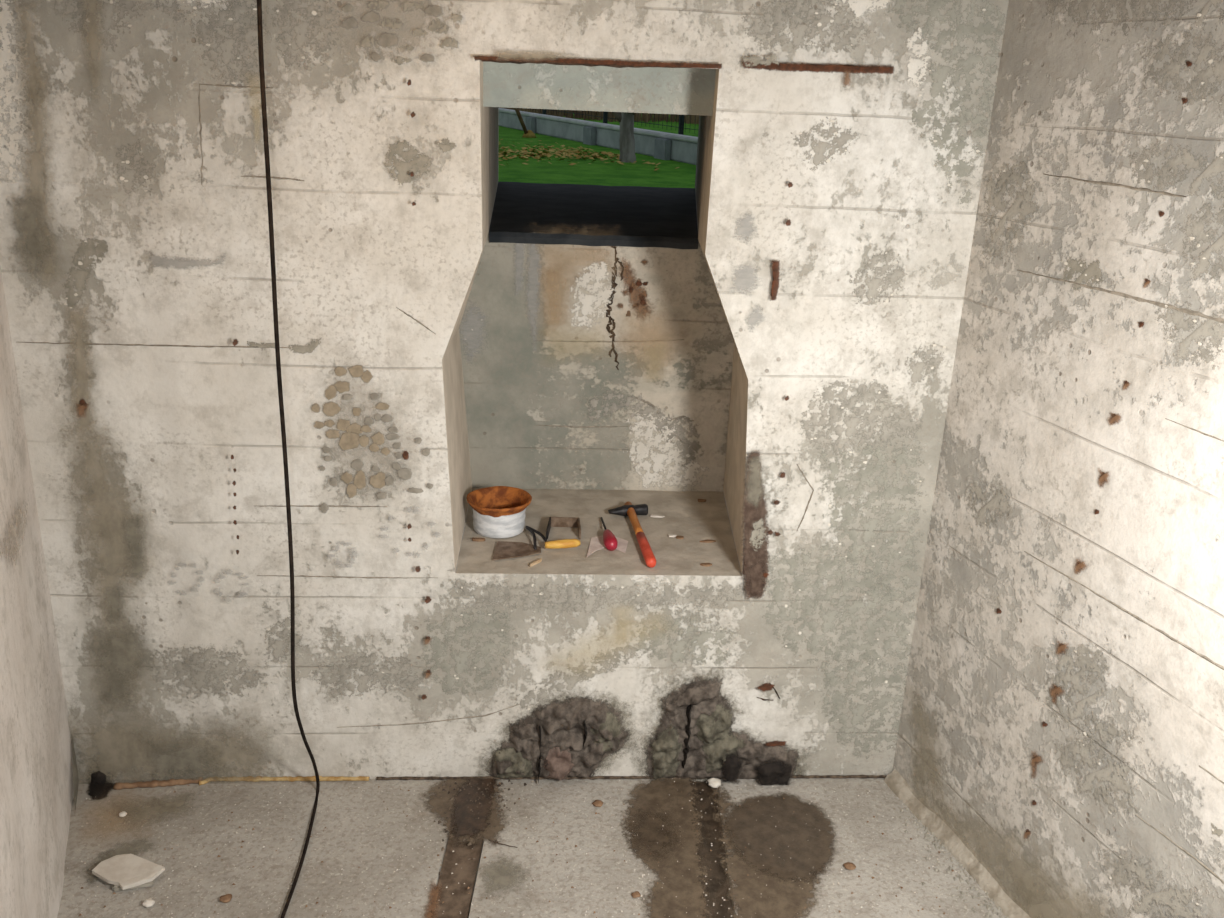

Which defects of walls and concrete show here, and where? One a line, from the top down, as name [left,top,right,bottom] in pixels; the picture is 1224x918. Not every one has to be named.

corrosion [742,54,894,85]
peeling [742,0,1039,262]
peeling [1046,0,1224,117]
crack [535,246,684,370]
corrosion [618,260,652,318]
corrosion [770,261,780,300]
peeling [311,365,440,572]
water stain [71,313,264,810]
spalling [313,577,805,786]
water stain [425,884,440,918]
water stain [423,778,506,845]
water stain [621,778,835,918]